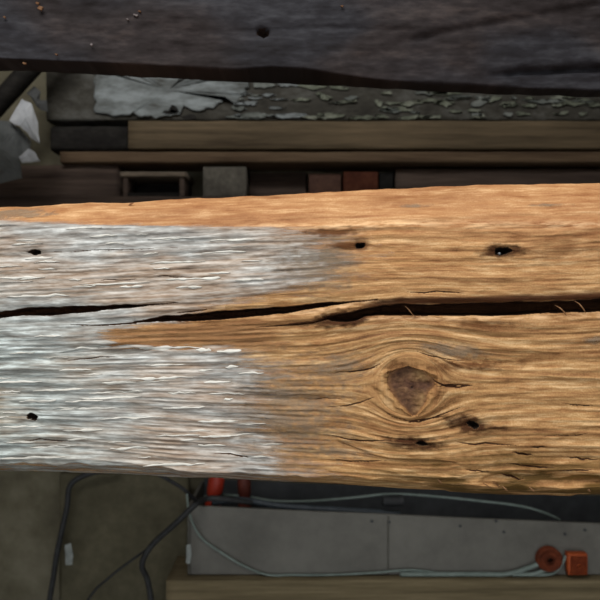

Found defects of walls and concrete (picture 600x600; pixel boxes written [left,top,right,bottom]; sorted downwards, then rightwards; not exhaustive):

peeling [93,74,600,120]
crack [0,291,600,327]